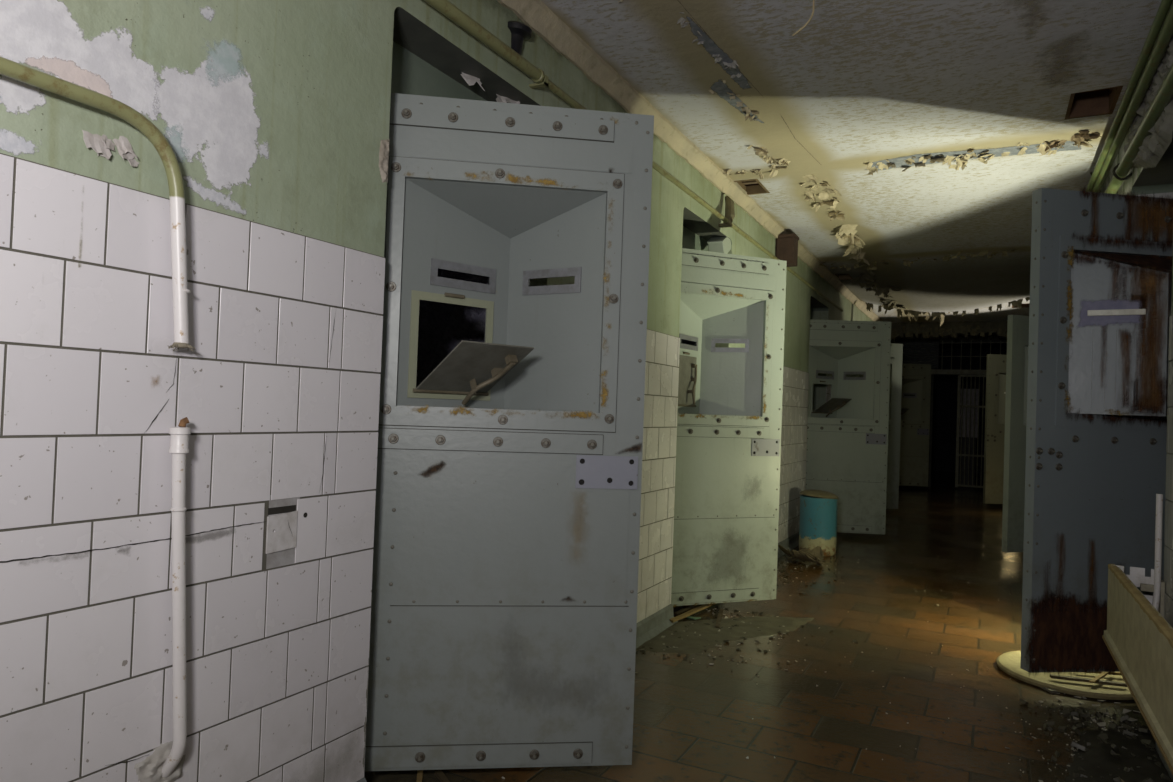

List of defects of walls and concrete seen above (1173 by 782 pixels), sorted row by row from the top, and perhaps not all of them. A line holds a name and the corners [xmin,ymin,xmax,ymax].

peeling [0,0,269,215]
peeling [721,145,791,179]
peeling [867,131,1102,175]
peeling [800,174,1030,326]
rust [1065,187,1173,426]
rust [1026,536,1119,675]